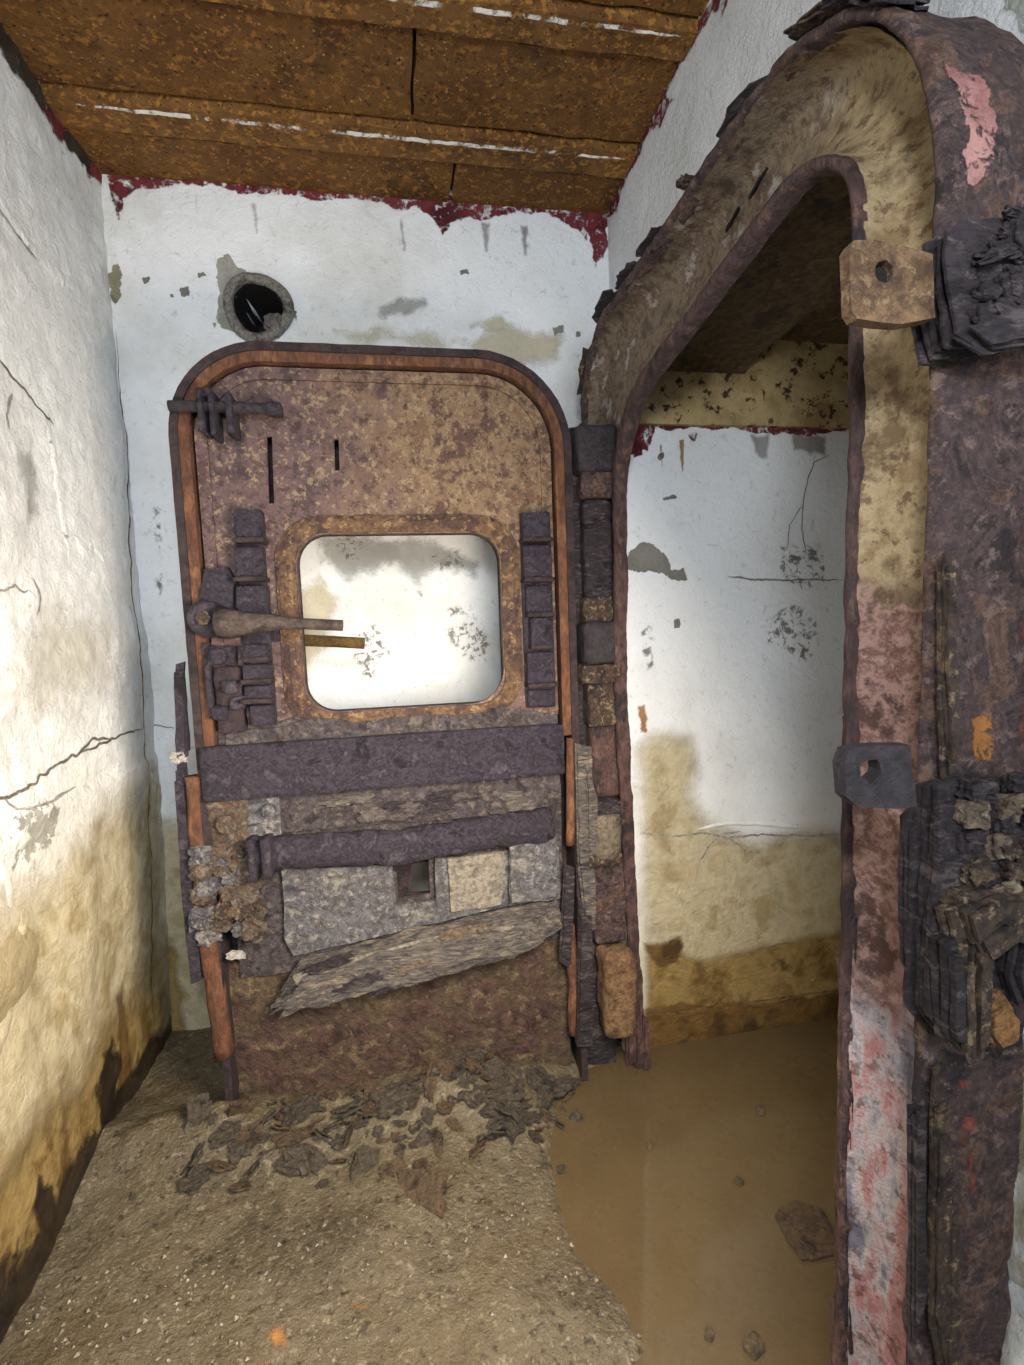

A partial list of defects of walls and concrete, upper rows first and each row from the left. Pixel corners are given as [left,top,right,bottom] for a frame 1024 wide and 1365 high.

peeling [107,0,728,266]
peeling [1004,0,1024,32]
crack [0,338,173,1034]
flaking render [628,542,687,581]
leakage [641,737,841,1048]
leakage [0,780,209,1345]